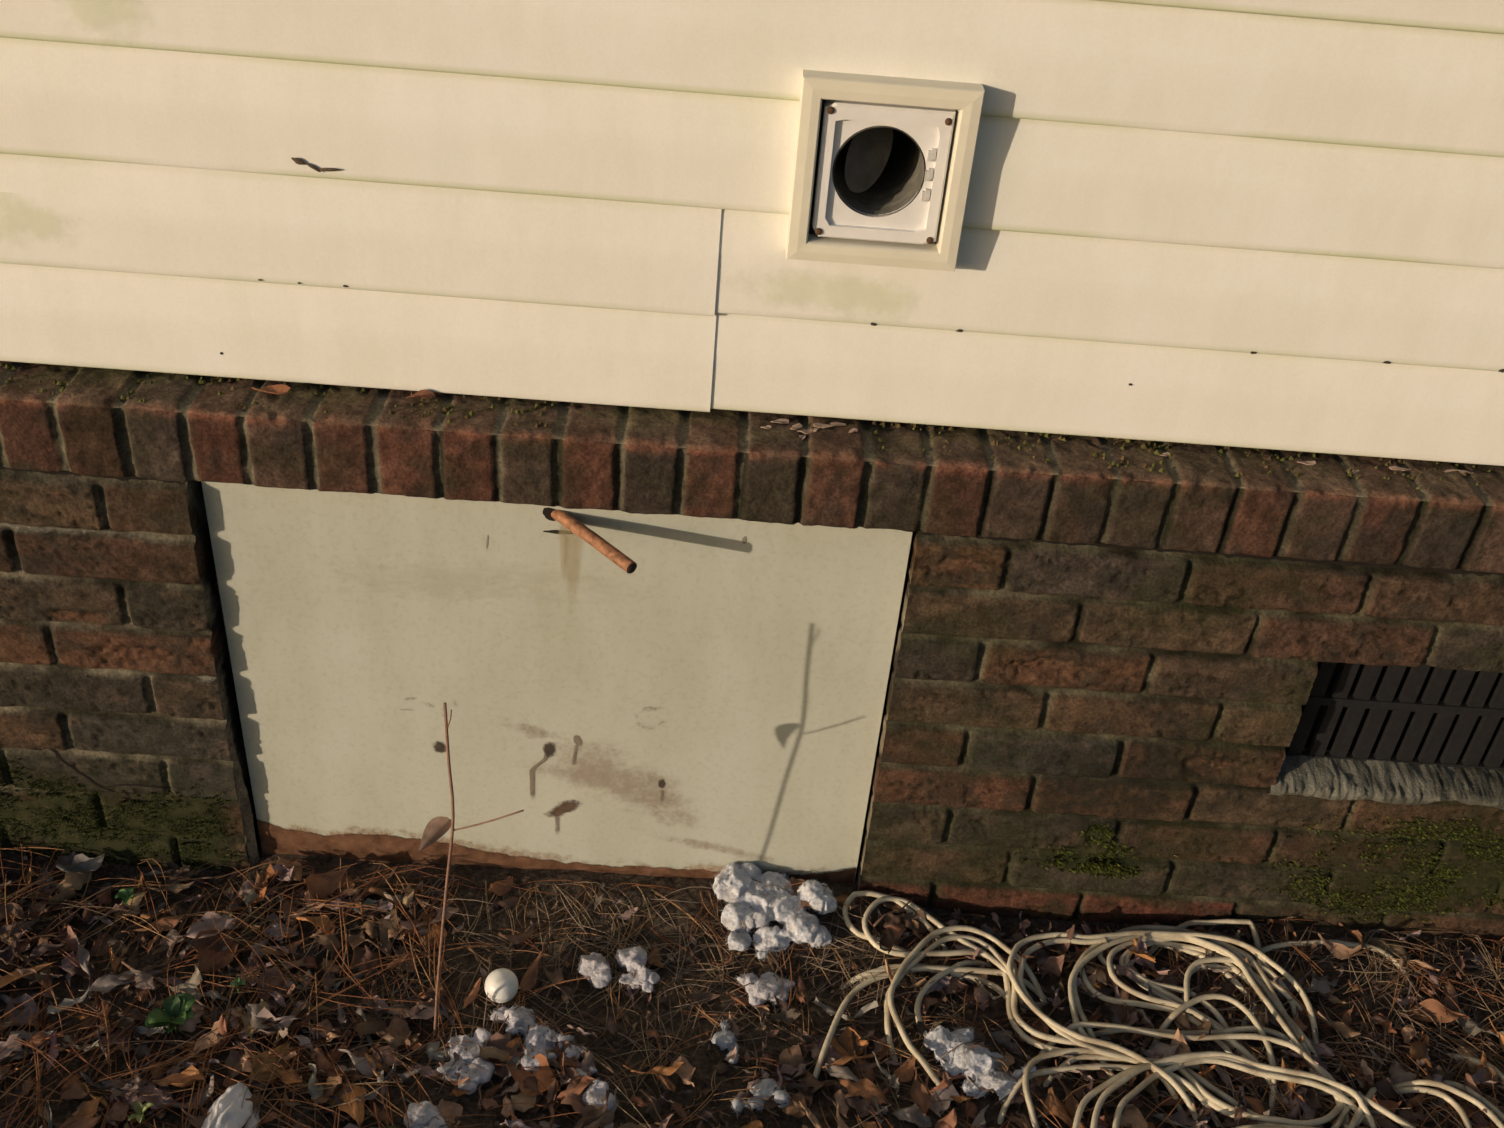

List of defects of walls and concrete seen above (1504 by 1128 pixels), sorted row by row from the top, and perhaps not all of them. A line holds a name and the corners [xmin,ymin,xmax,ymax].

corrosion [257,820,720,878]
corrosion [787,868,856,883]